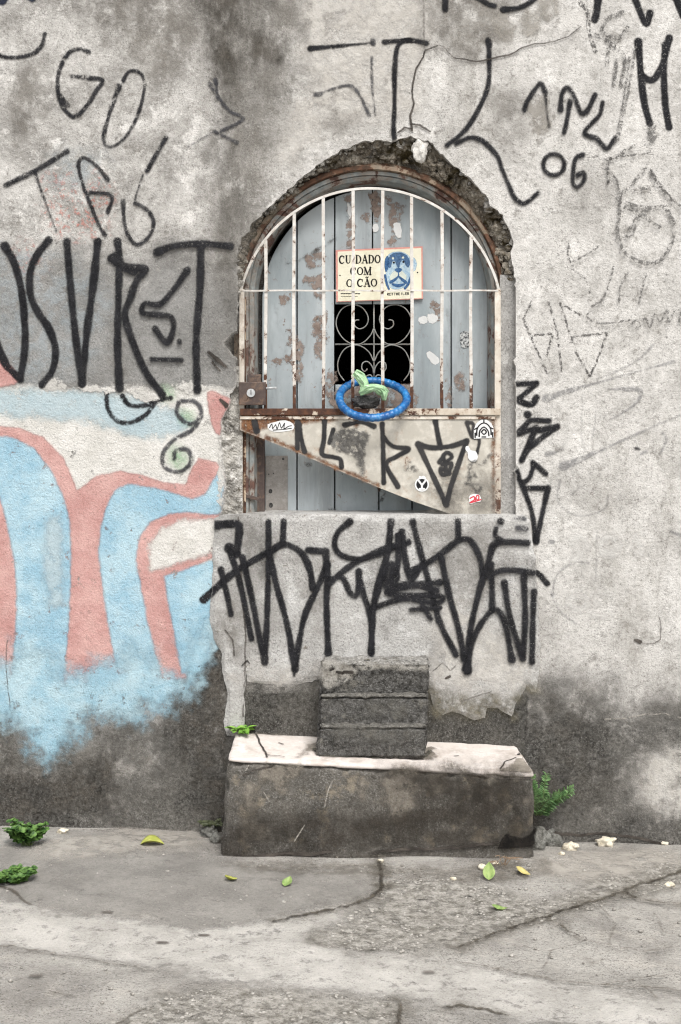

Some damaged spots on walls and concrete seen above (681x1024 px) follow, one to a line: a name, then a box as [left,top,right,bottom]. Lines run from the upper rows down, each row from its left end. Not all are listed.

crack [397,28,579,133]
flaking render [236,137,515,299]
peeling [43,377,160,402]
peeling [172,380,208,394]
flaking render [214,333,243,515]
corrosion [241,415,379,487]
damp [0,653,229,859]
peeling [426,689,532,772]
damp [524,693,681,886]
crack [273,856,384,922]
crack [448,869,681,990]